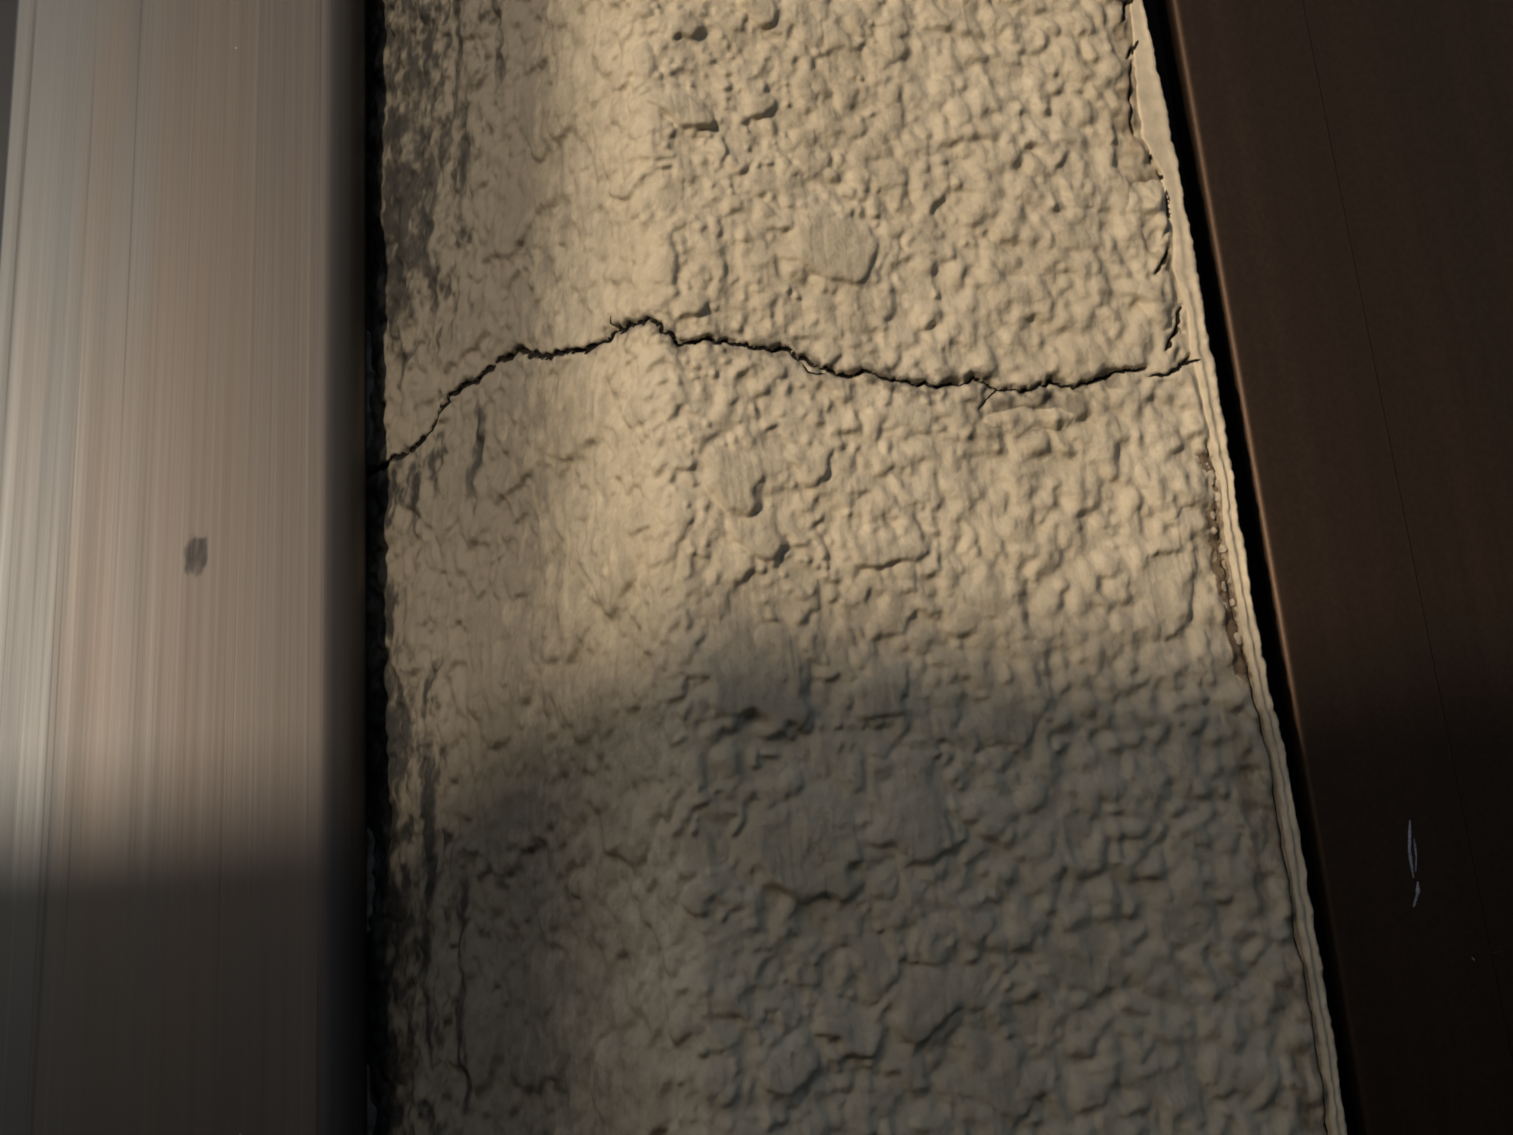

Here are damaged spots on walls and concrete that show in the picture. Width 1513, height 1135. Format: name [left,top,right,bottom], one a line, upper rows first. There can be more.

crack [1123,0,1171,274]
crack [367,306,1201,477]